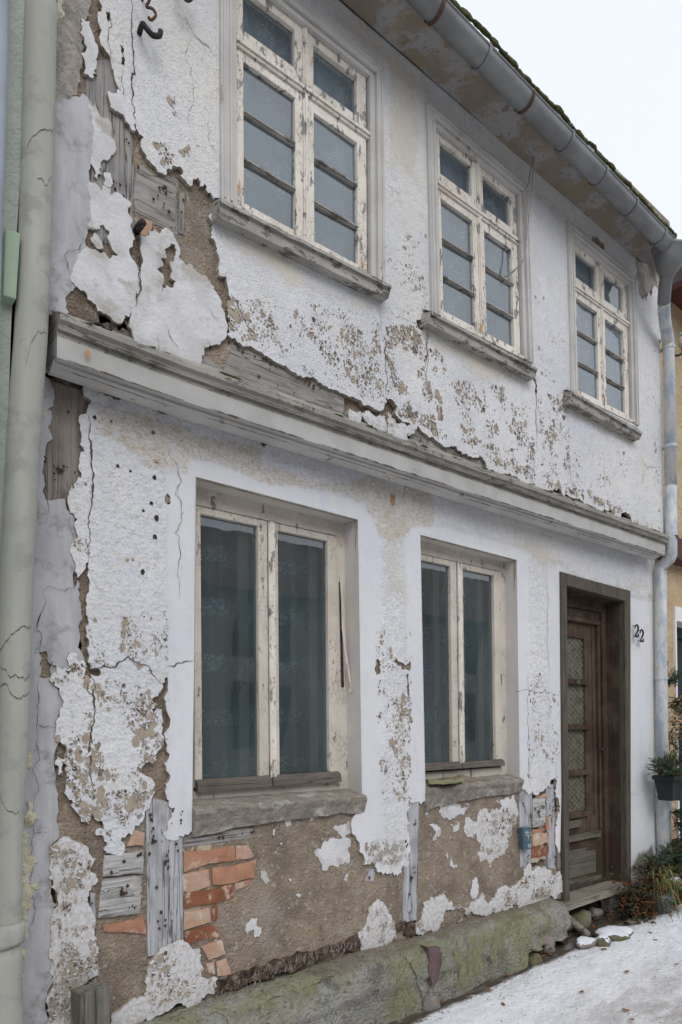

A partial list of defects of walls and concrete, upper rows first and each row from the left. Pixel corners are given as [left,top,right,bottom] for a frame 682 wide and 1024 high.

spalling [47,0,661,530]
crack [0,586,68,937]
crack [87,656,193,791]
spalling [39,538,563,1024]